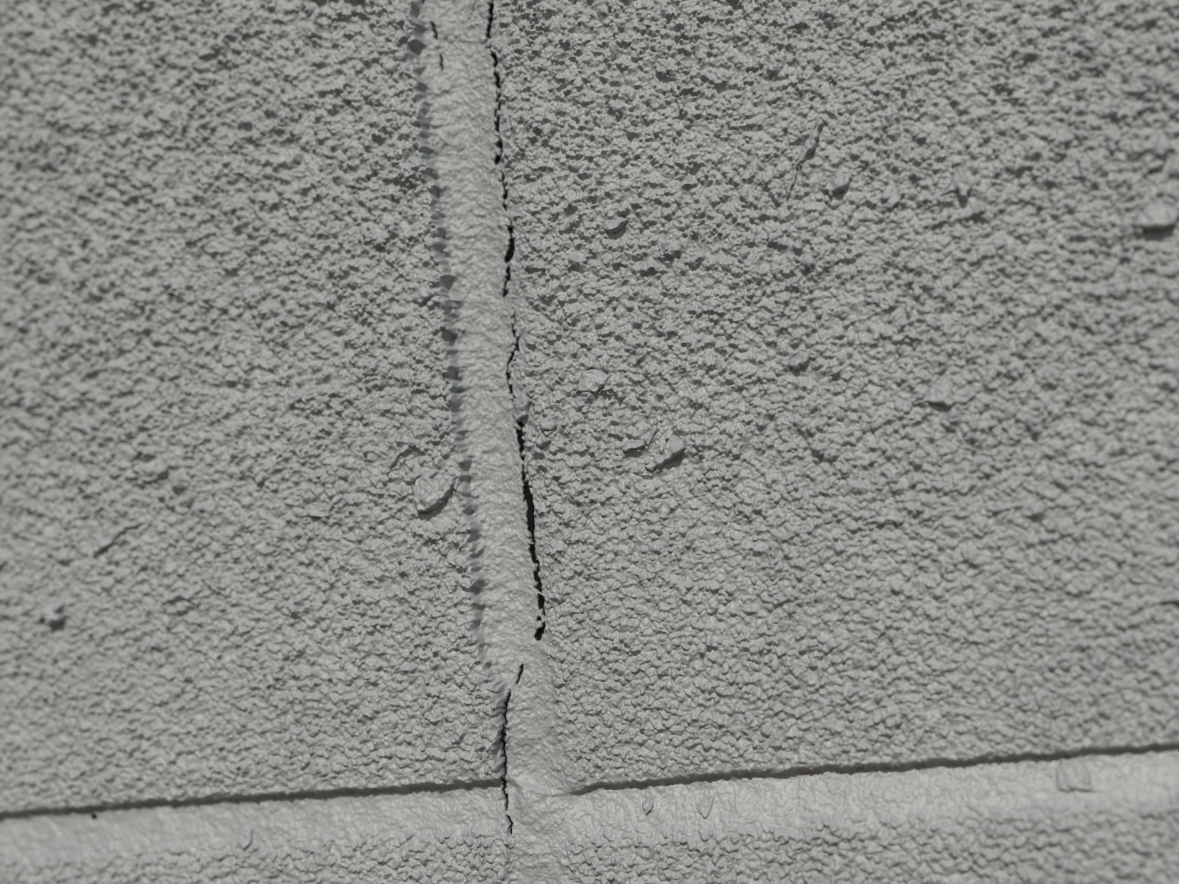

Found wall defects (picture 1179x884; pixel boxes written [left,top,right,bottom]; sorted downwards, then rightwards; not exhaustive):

crack [484,0,545,640]
crack [501,665,523,834]